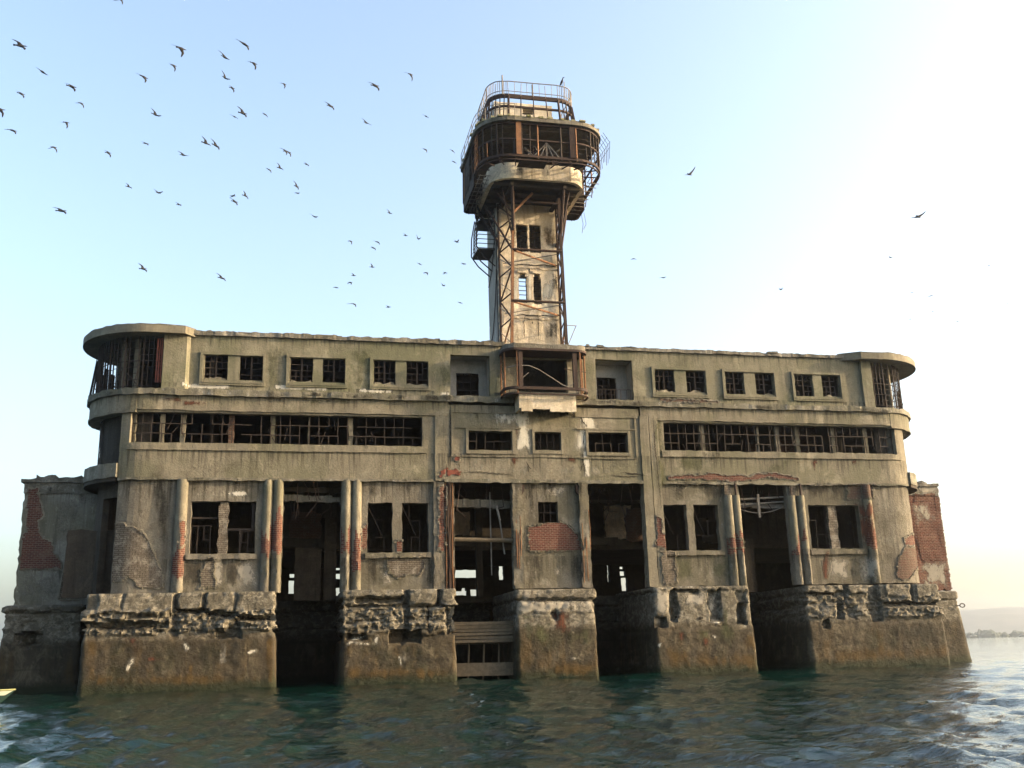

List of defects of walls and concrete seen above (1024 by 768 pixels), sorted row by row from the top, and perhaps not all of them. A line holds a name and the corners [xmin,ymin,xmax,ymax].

water stain [496,411,540,450]
water stain [503,412,609,511]
flaking render [18,486,63,571]
spalling [111,522,165,590]
flaking render [527,521,584,553]
spalling [667,472,800,523]
flaking render [895,484,946,585]